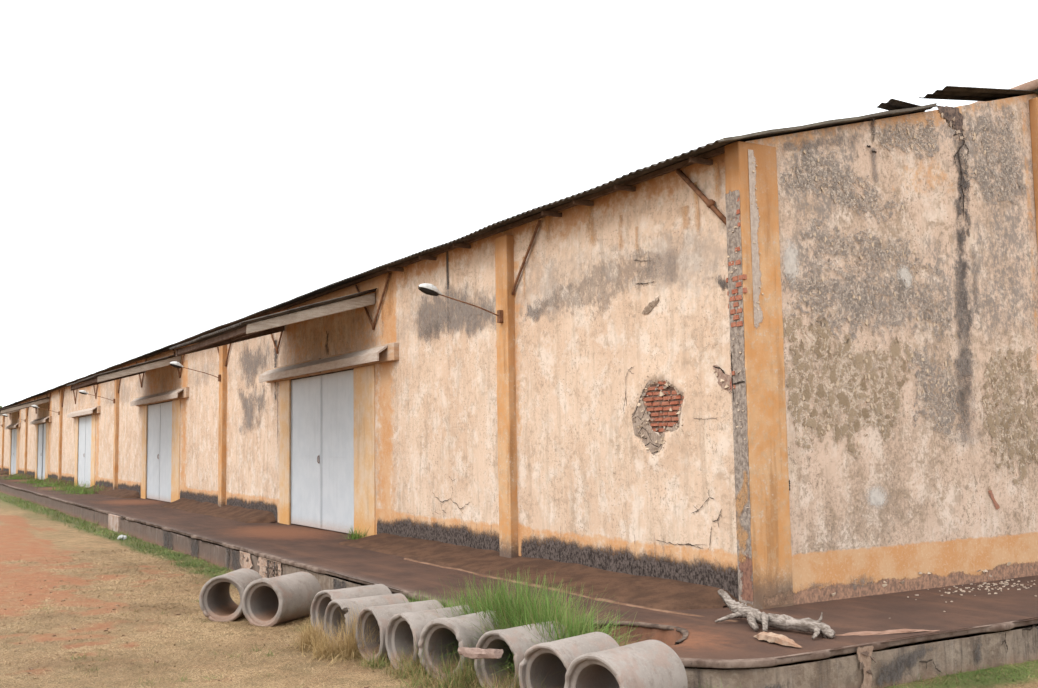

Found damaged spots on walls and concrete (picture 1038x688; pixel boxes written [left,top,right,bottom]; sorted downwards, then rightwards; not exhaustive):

peeling [877,106,1026,205]
peeling [779,149,964,459]
damp [954,129,978,440]
spalling [631,376,684,458]
spalling [712,149,764,605]
mould [377,519,500,552]
damp [521,535,739,600]